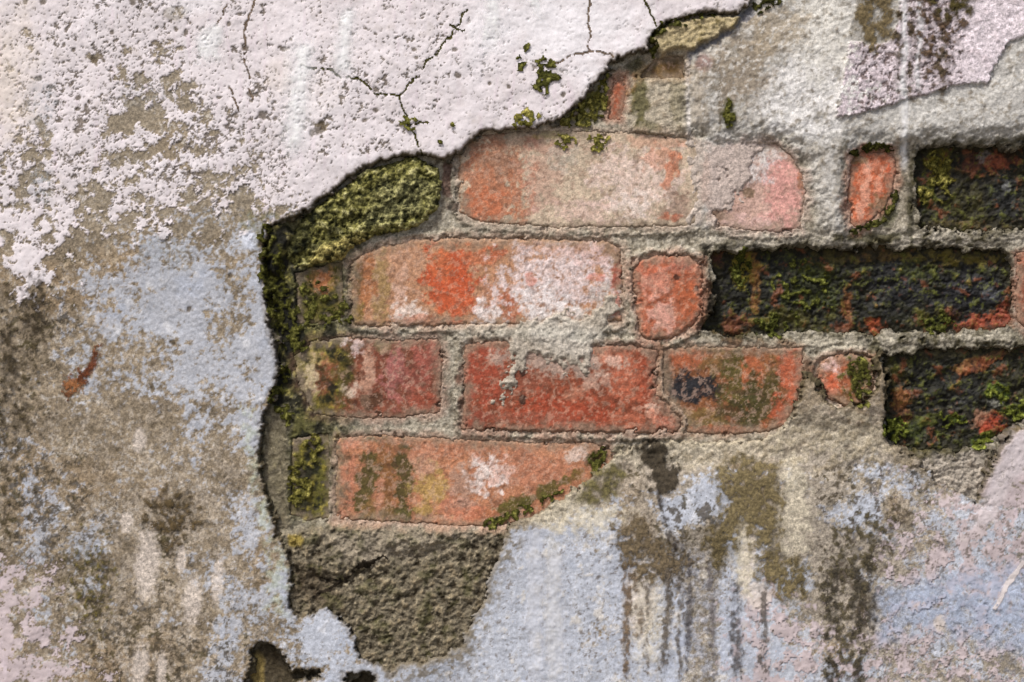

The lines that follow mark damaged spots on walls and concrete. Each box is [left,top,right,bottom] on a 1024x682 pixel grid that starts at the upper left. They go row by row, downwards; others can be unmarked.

crack [216,0,256,111]
crack [309,9,468,156]
crack [555,0,614,64]
rust [61,344,101,401]
spalling [261,0,1024,682]
water stain [579,437,912,682]
spalling [246,641,320,682]